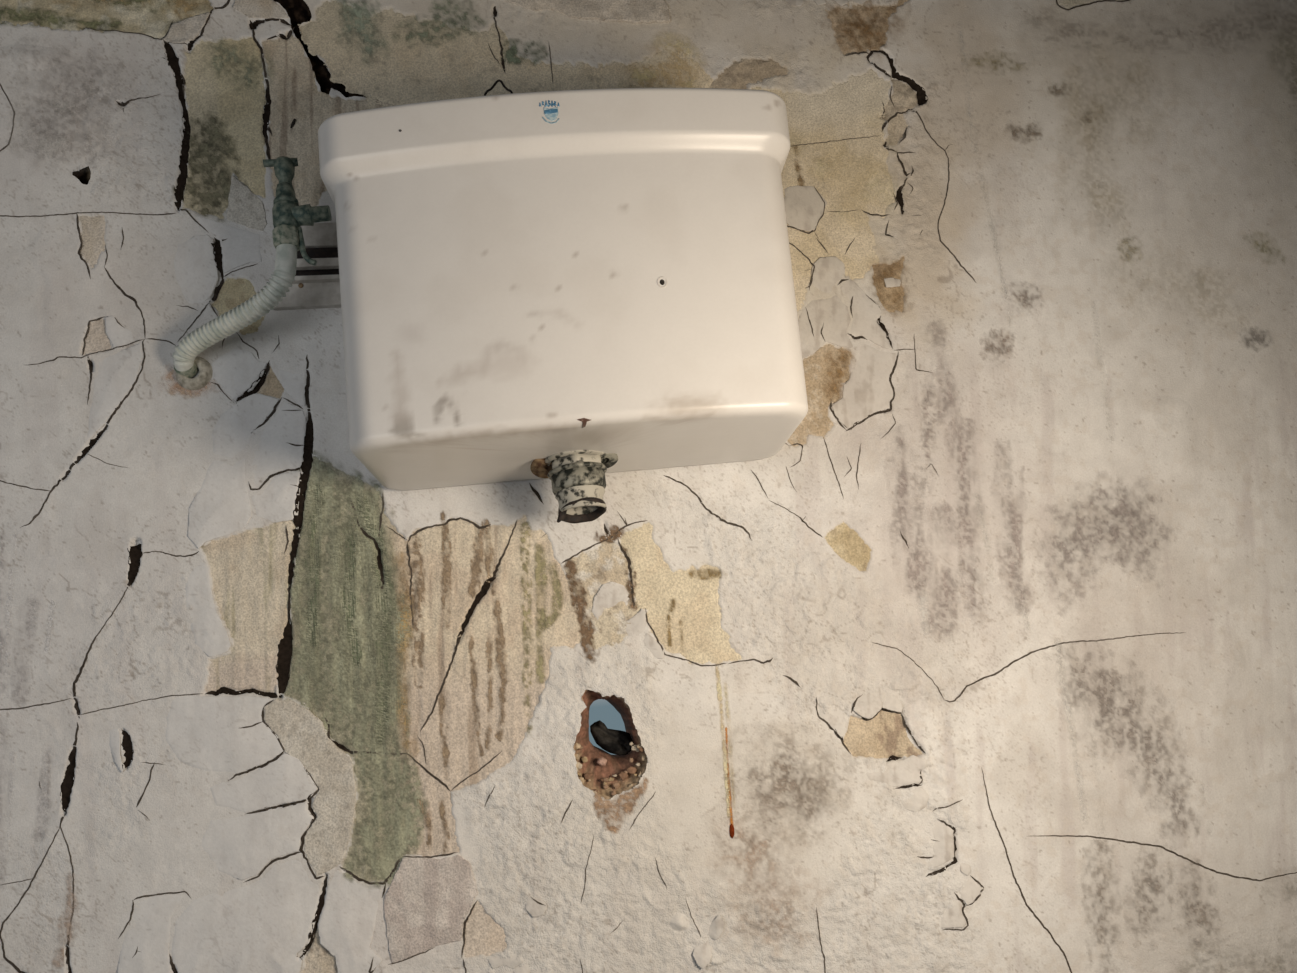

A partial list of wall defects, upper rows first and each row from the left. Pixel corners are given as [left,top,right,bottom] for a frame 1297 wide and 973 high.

flaking render [72,166,91,185]
flaking render [174,0,918,446]
crack [751,50,975,537]
crack [0,0,458,973]
flaking render [117,316,741,973]
crack [325,483,547,806]
corrosion [716,667,734,838]
crack [561,511,1072,973]
flaking render [819,693,929,812]
crack [872,632,1186,703]
water stain [1059,493,1133,576]
water stain [1072,668,1185,827]